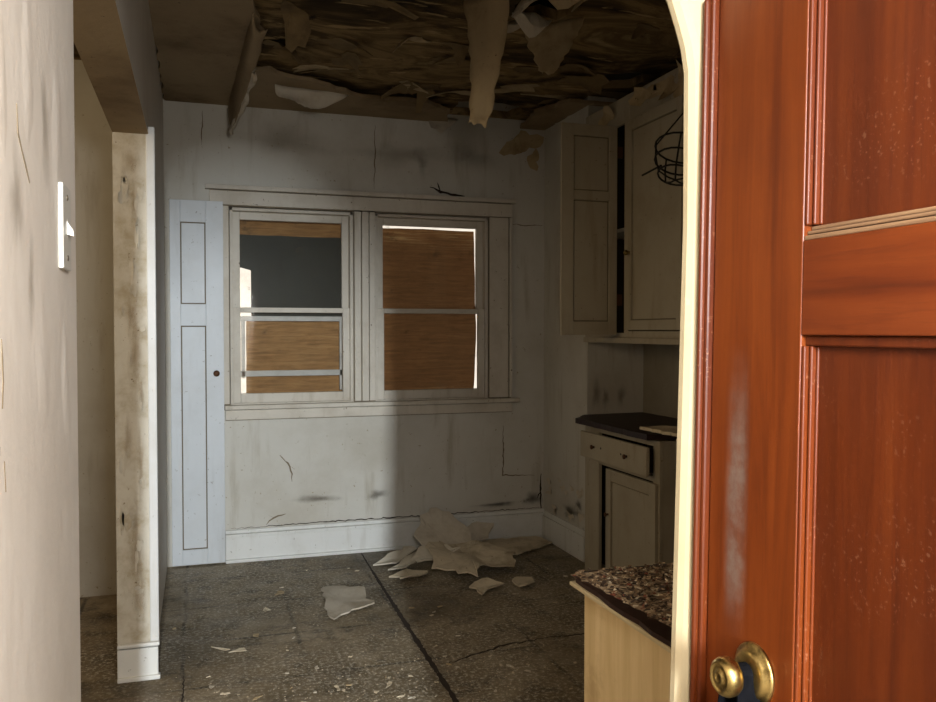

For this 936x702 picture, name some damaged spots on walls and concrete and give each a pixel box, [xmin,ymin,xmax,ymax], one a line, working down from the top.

flaking render [228,12,268,135]
flaking render [275,84,349,109]
flaking render [399,0,597,128]
peeling [598,50,683,126]
crack [361,553,584,702]